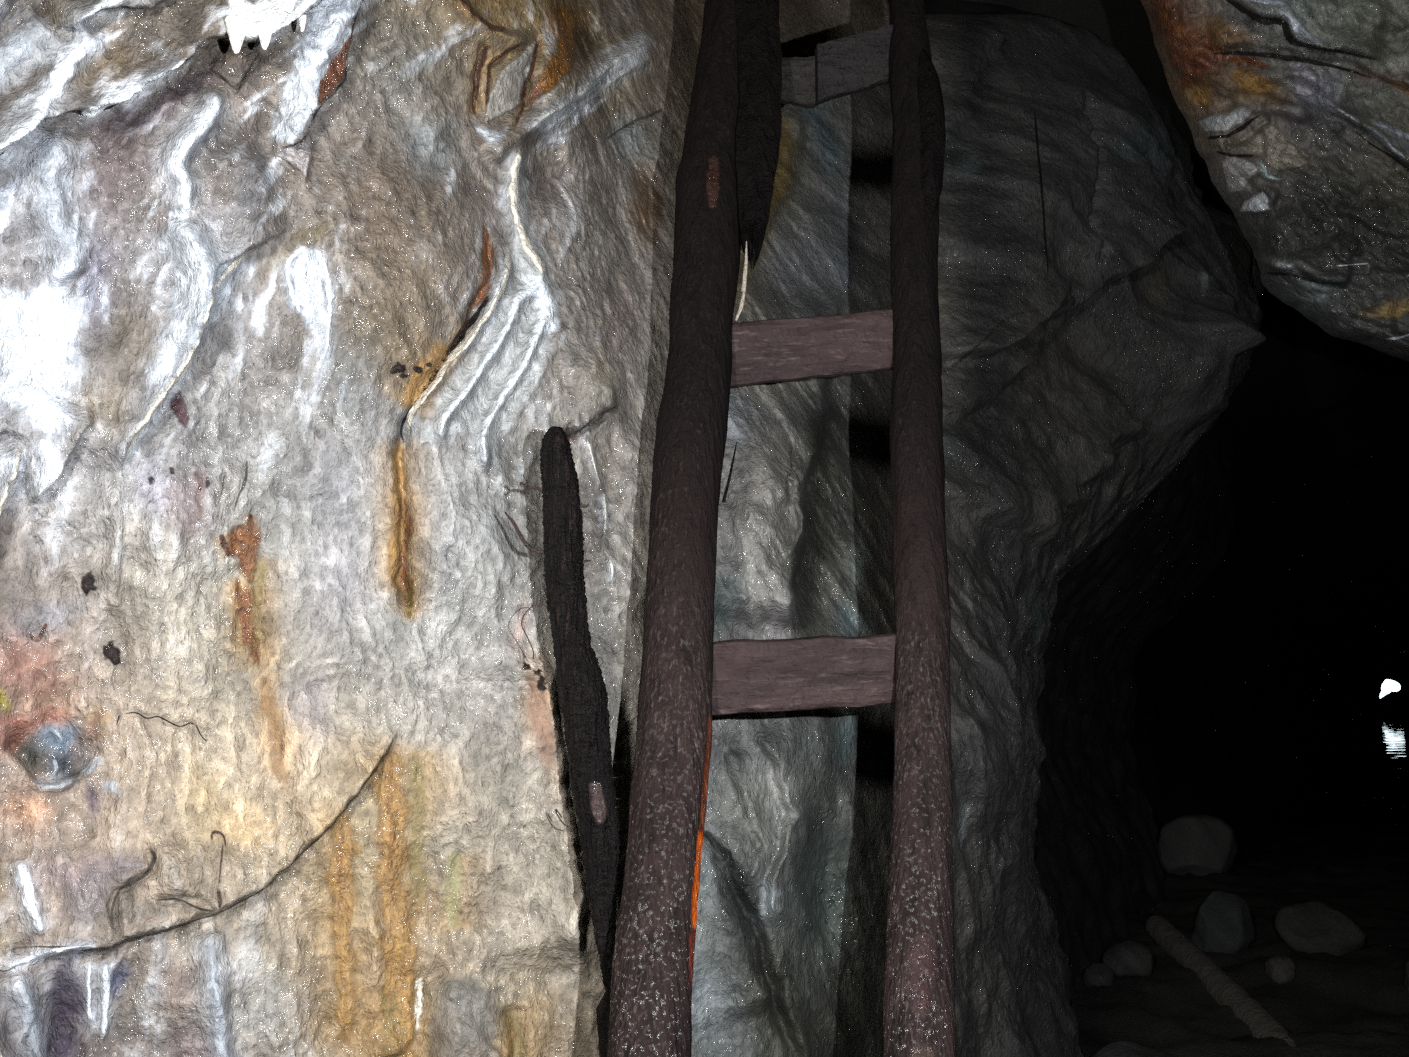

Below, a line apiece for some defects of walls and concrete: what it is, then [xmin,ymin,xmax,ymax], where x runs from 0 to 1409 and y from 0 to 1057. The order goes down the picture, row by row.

rust [220,514,264,663]
rust [388,442,413,618]